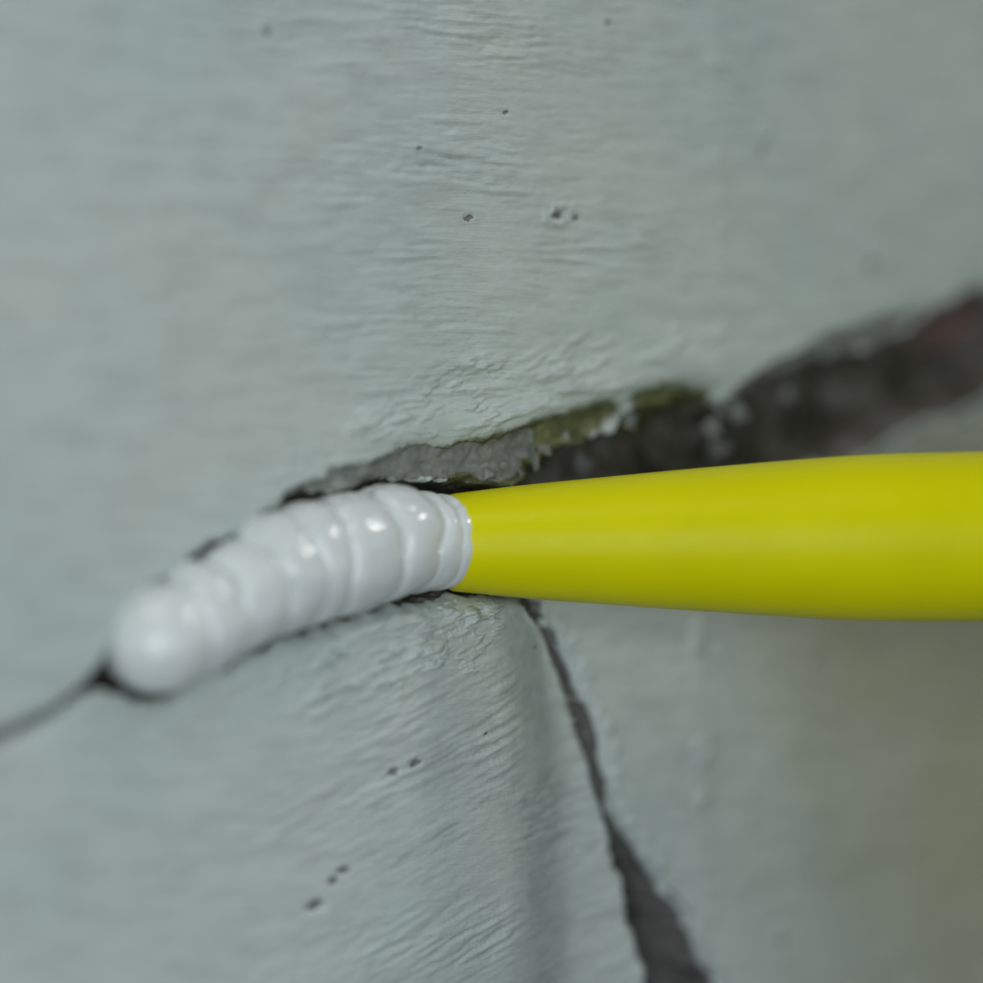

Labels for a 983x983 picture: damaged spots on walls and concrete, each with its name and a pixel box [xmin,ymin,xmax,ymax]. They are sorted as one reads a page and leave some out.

crack [278,287,983,509]
spalling [261,427,534,513]
crack [185,536,229,561]
crack [252,641,271,652]
crack [0,658,173,738]
crack [293,589,713,983]